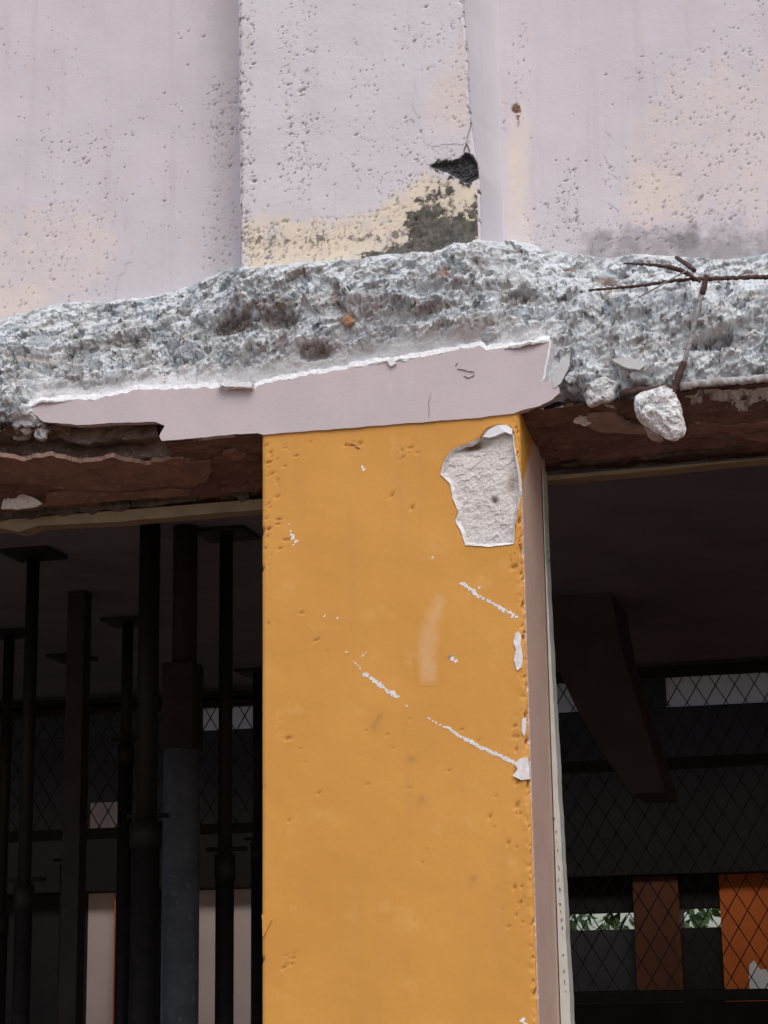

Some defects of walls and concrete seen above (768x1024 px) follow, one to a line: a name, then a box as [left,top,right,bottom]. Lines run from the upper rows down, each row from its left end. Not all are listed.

damp [193,0,478,283]
corrosion [500,87,546,249]
spalling [0,6,768,522]
spalling [440,425,522,547]
peeling [355,652,408,707]
peeling [460,582,518,618]
peeling [513,632,523,671]
flaking render [428,717,531,780]